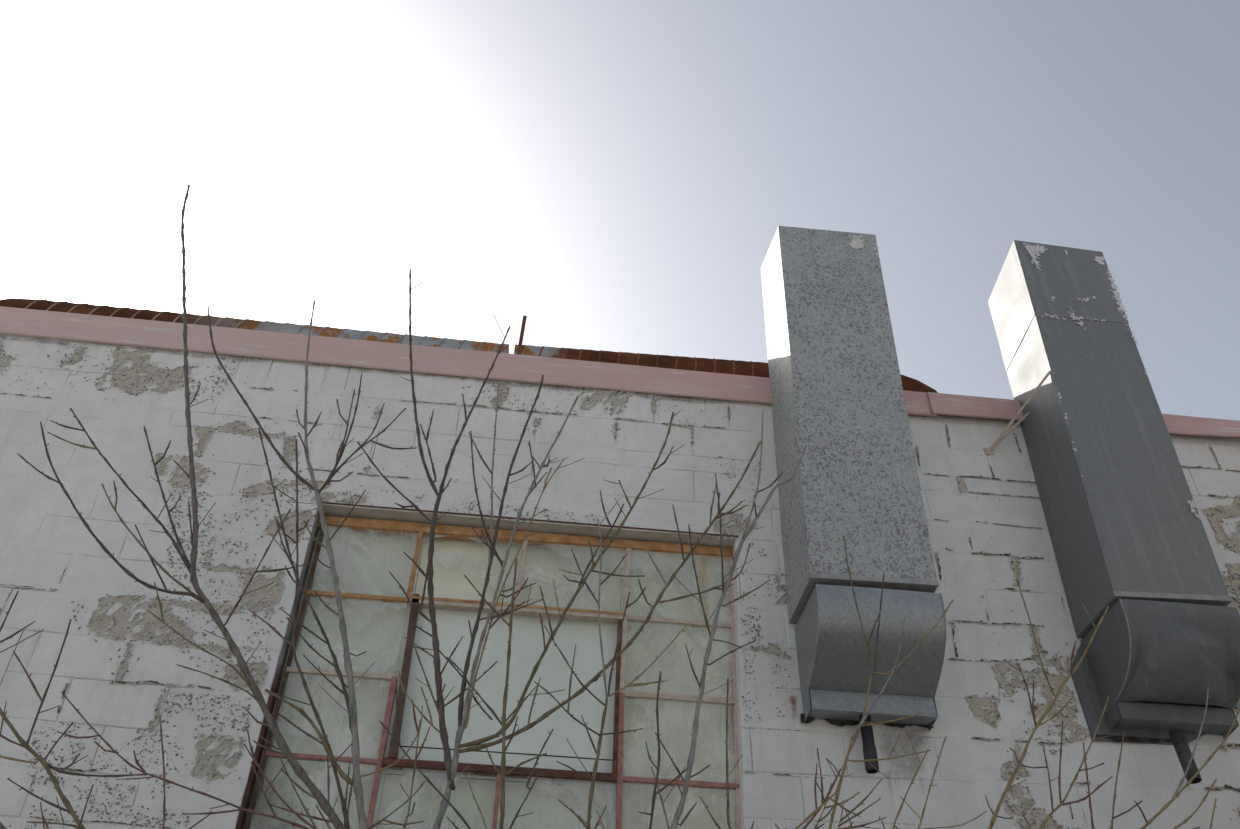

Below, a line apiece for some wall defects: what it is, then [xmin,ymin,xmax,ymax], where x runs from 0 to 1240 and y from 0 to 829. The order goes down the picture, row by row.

peeling [43,343,200,400]
peeling [150,420,384,545]
peeling [78,535,287,691]
peeling [966,623,1092,743]
peeling [998,744,1064,829]